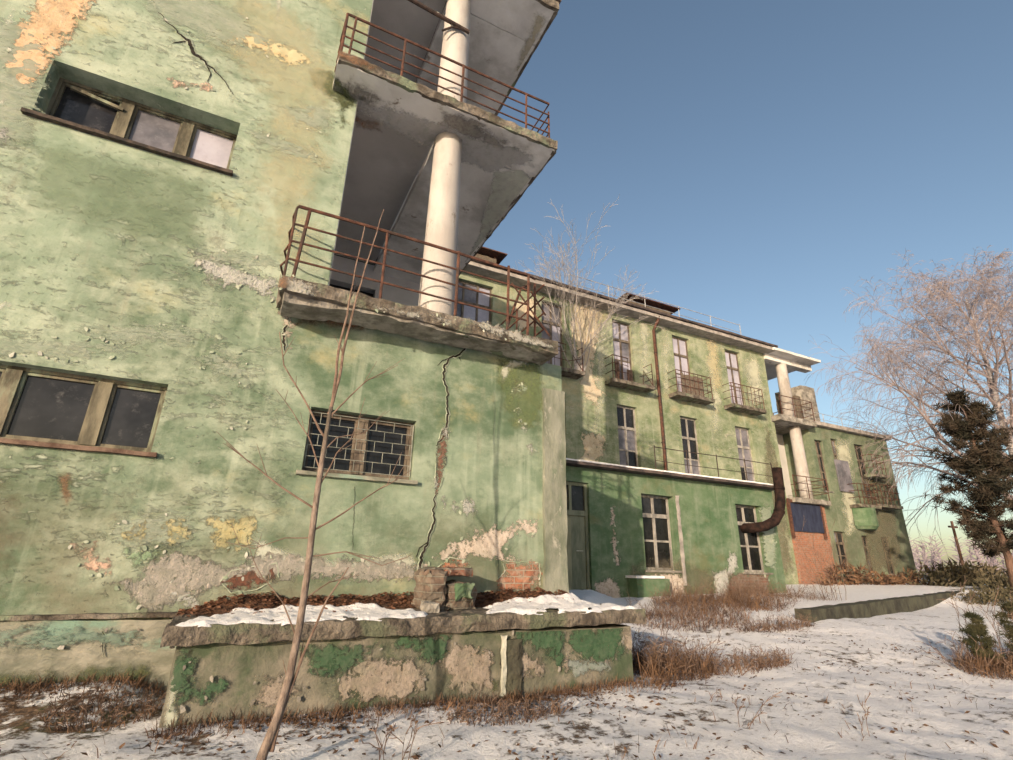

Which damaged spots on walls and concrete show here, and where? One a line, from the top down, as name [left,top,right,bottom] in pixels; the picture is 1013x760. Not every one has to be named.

peeling [0,0,97,150]
crack [153,0,234,95]
peeling [223,28,310,66]
corrosion [297,319,364,330]
crack [436,348,466,446]
peeling [569,304,607,407]
peeling [578,432,607,462]
flaking render [68,427,542,619]
crack [416,490,438,570]
flaking render [594,578,623,598]
peeling [712,504,778,594]
flaking render [299,634,494,706]